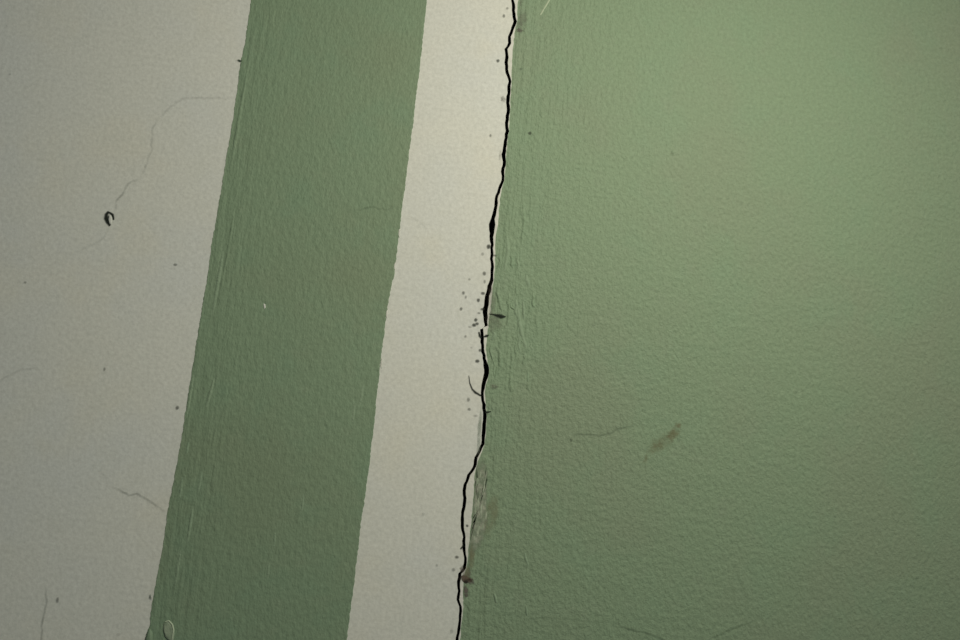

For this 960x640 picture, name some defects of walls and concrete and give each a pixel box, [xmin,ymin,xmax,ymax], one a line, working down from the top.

crack [456,0,517,640]